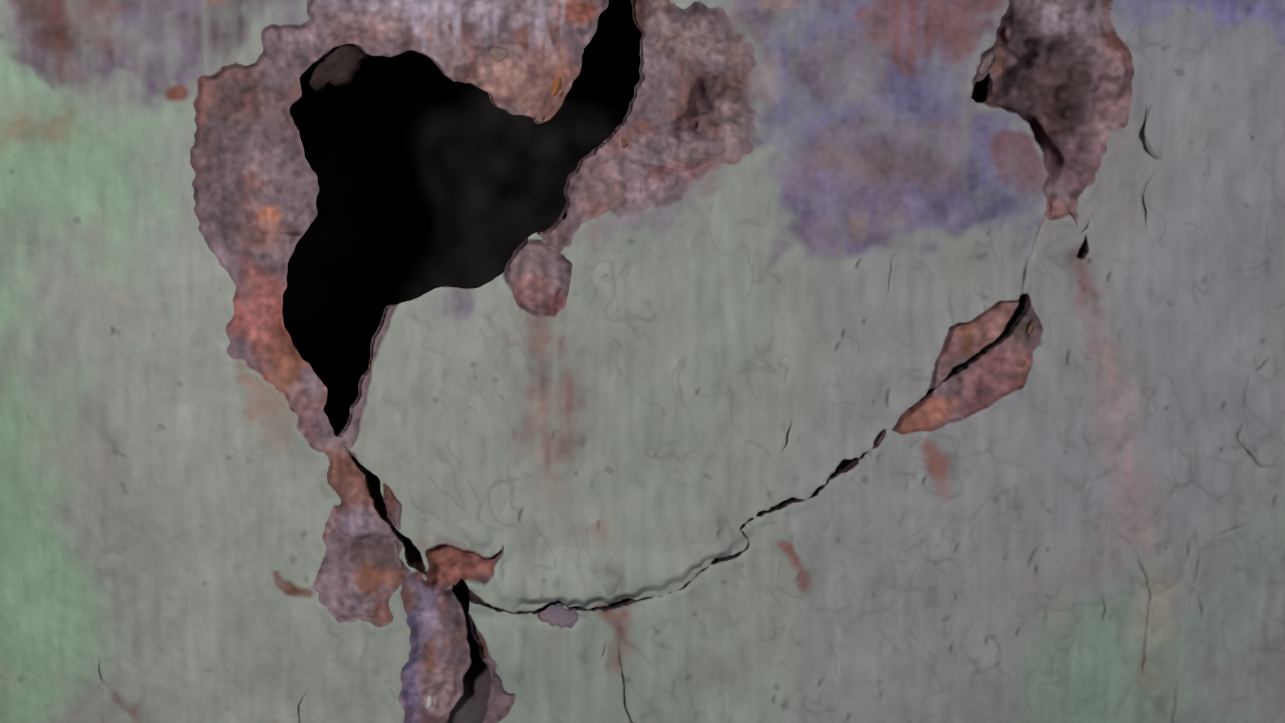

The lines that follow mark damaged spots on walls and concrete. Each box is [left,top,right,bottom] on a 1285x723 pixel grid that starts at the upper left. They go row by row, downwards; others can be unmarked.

peeling [504,0,1285,317]
spalling [0,0,609,723]
spalling [873,292,1043,449]
crack [469,447,875,615]
crack [602,640,633,723]